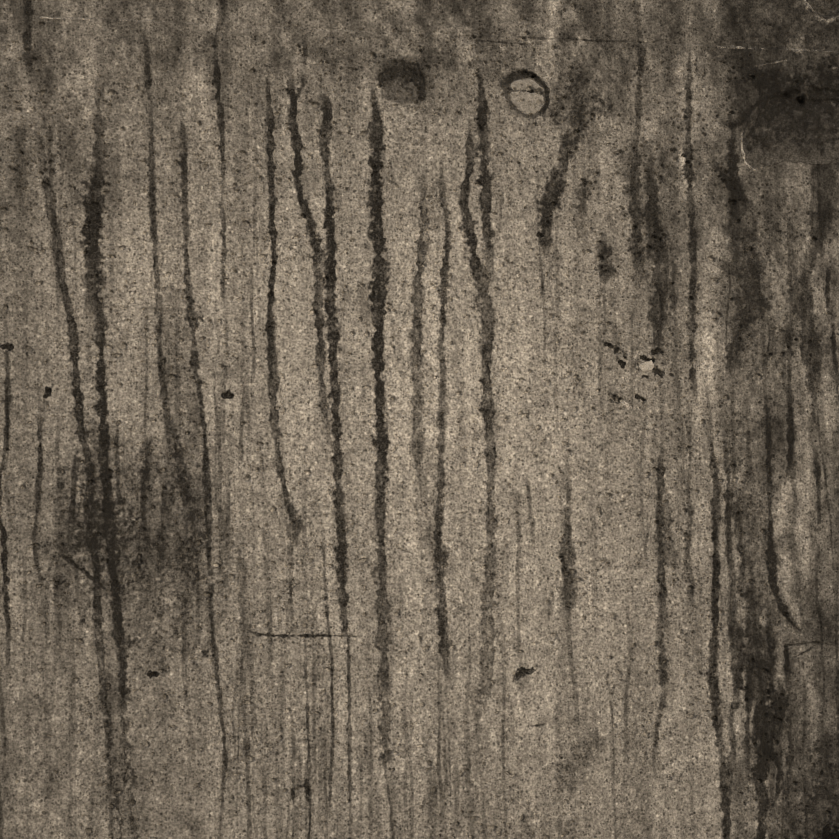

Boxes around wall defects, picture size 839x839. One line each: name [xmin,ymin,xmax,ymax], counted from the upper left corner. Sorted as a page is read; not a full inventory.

water stain [0,517,11,656]
water stain [33,124,228,778]
water stain [213,59,225,163]
water stain [265,87,303,539]
water stain [286,79,352,800]
water stain [367,99,391,690]
water stain [433,360,452,669]
water stain [438,186,451,350]
water stain [459,76,498,620]
water stain [536,74,613,247]
water stain [706,395,799,839]
water stain [786,193,833,396]